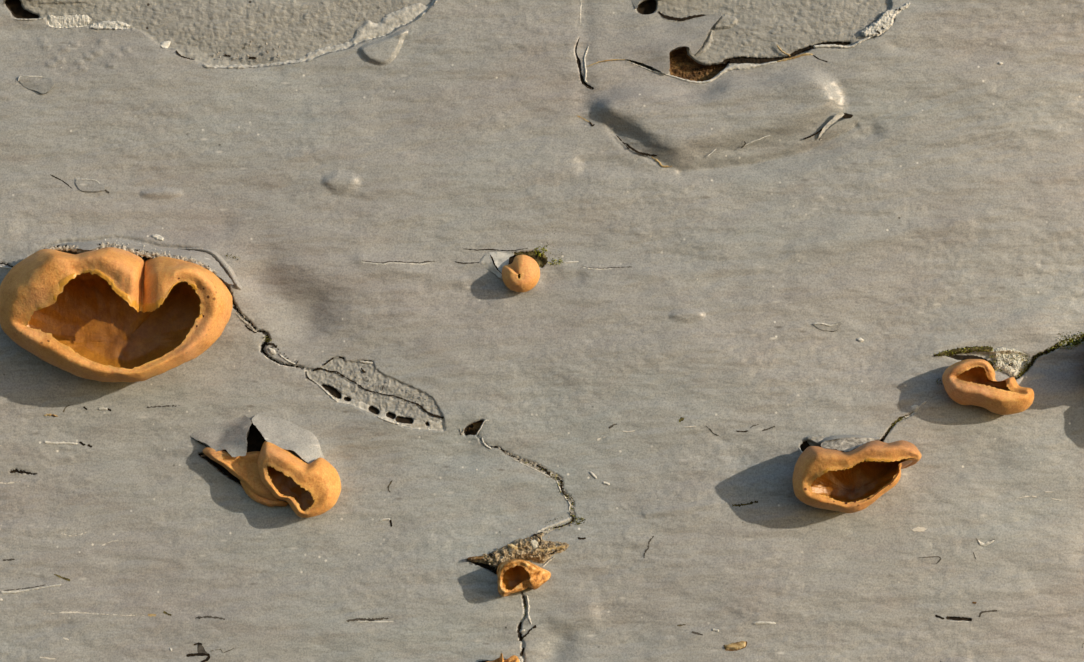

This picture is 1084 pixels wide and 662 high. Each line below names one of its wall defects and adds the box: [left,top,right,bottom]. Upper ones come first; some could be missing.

peeling [5,0,438,69]
peeling [576,0,910,84]
peeling [818,112,858,140]
crack [226,286,304,369]
spalling [306,356,445,431]
peeling [190,415,324,484]
crack [481,438,585,537]
spalling [466,533,569,574]
crack [346,616,394,624]
crack [517,592,537,661]